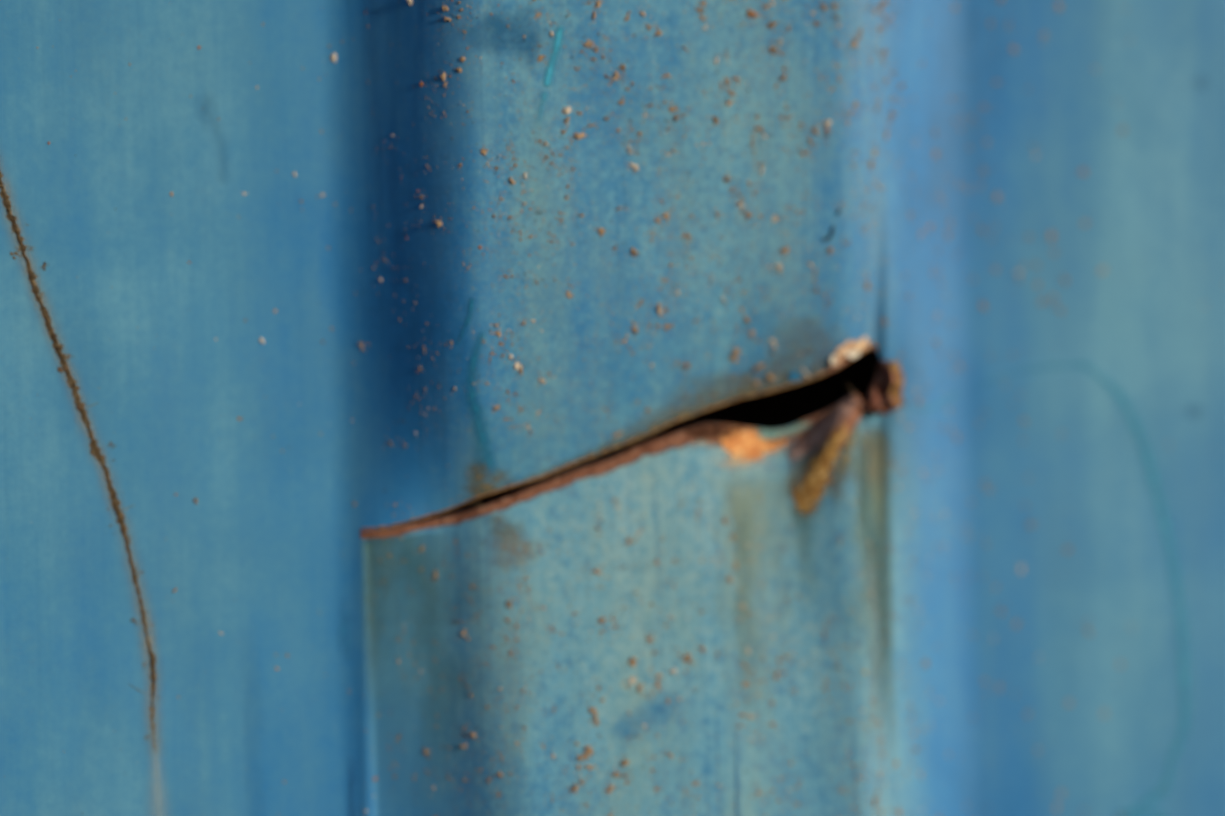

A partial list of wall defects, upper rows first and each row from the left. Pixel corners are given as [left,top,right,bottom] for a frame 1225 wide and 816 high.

corrosion [360,392,865,540]
corrosion [837,429,889,605]